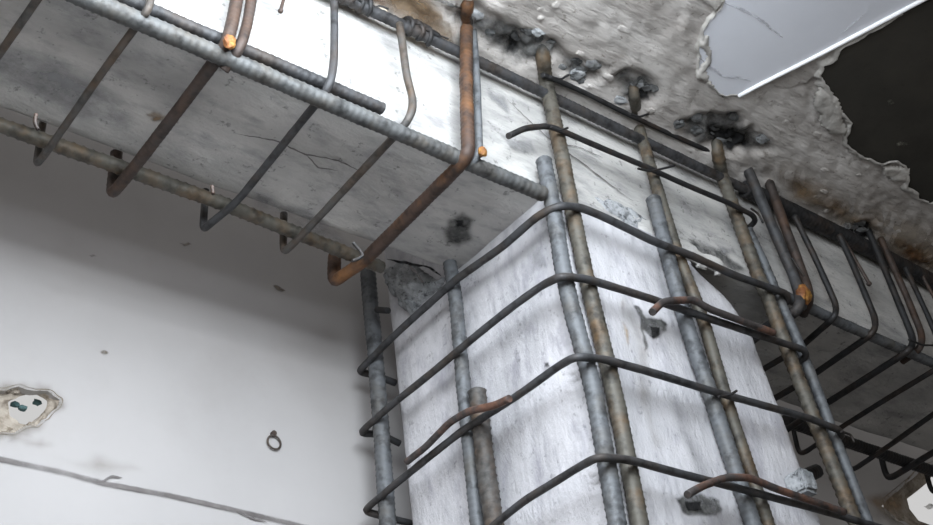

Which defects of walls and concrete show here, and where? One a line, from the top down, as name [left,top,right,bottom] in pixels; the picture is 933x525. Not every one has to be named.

rust [383,0,447,36]
spalling [65,0,460,165]
spalling [0,117,130,175]
spalling [133,167,360,262]
spalling [338,0,933,525]
spalling [0,384,63,435]